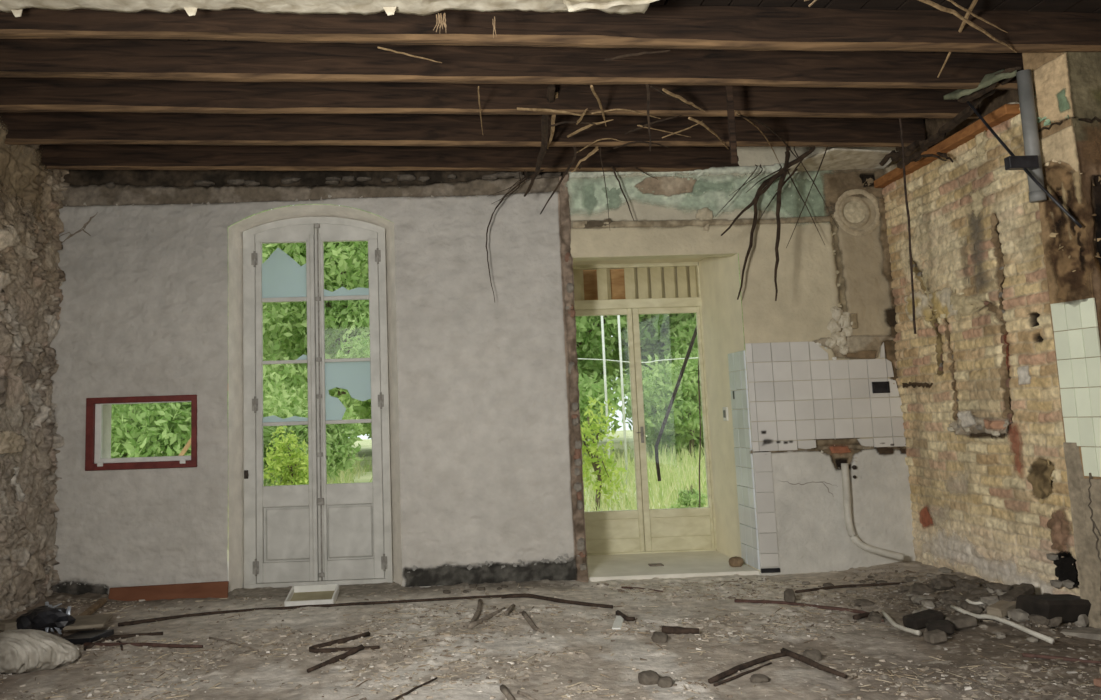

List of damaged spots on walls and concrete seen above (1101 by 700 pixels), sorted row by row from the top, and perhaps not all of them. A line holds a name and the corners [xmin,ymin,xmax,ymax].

peeling [1032,54,1083,174]
peeling [61,164,803,207]
peeling [814,198,1006,388]
damp [1042,165,1101,303]
spalling [815,438,907,469]
flaking render [947,399,1014,439]
flaking render [403,538,585,587]
spalling [1027,457,1079,589]